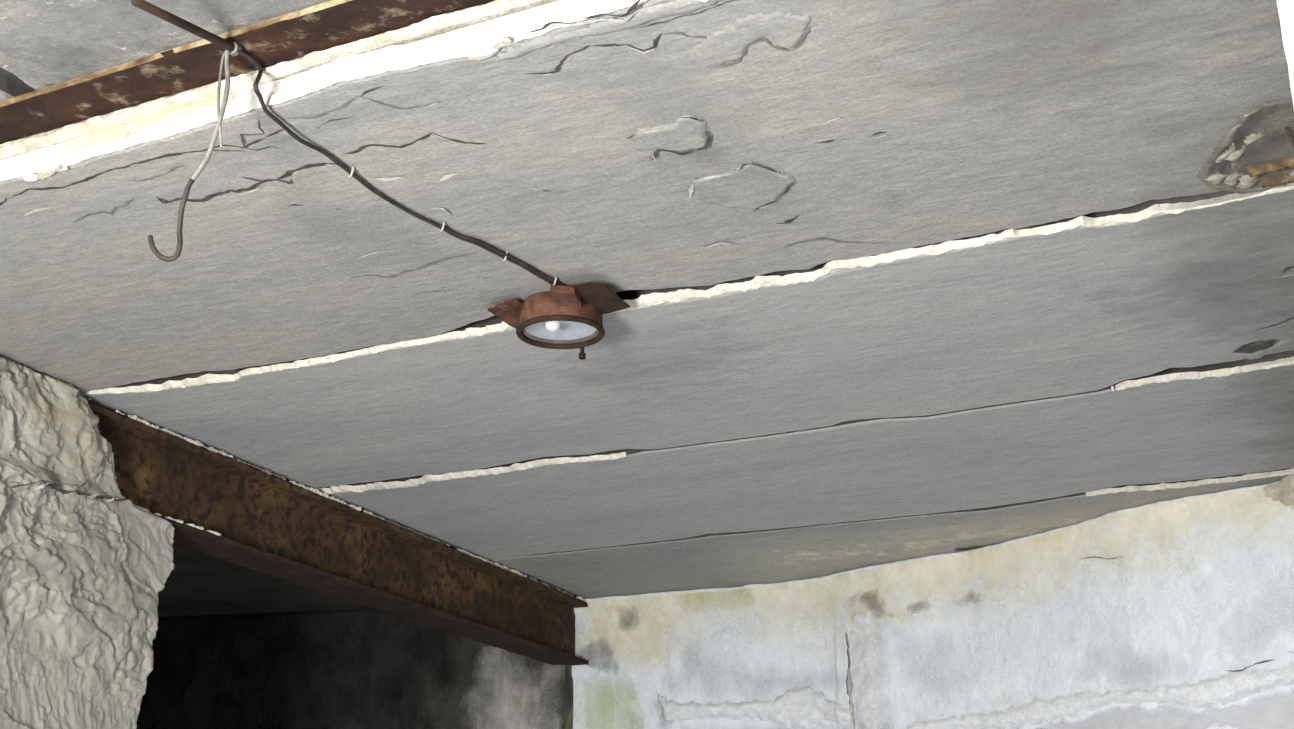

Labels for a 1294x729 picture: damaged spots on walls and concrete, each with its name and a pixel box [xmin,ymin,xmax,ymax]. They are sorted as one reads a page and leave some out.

crack [519,0,707,75]
peeling [21,164,68,182]
crack [0,86,485,223]
spalling [1195,99,1294,194]
crack [351,251,470,294]
crack [704,241,739,249]
crack [778,238,877,249]
water stain [140,610,449,729]